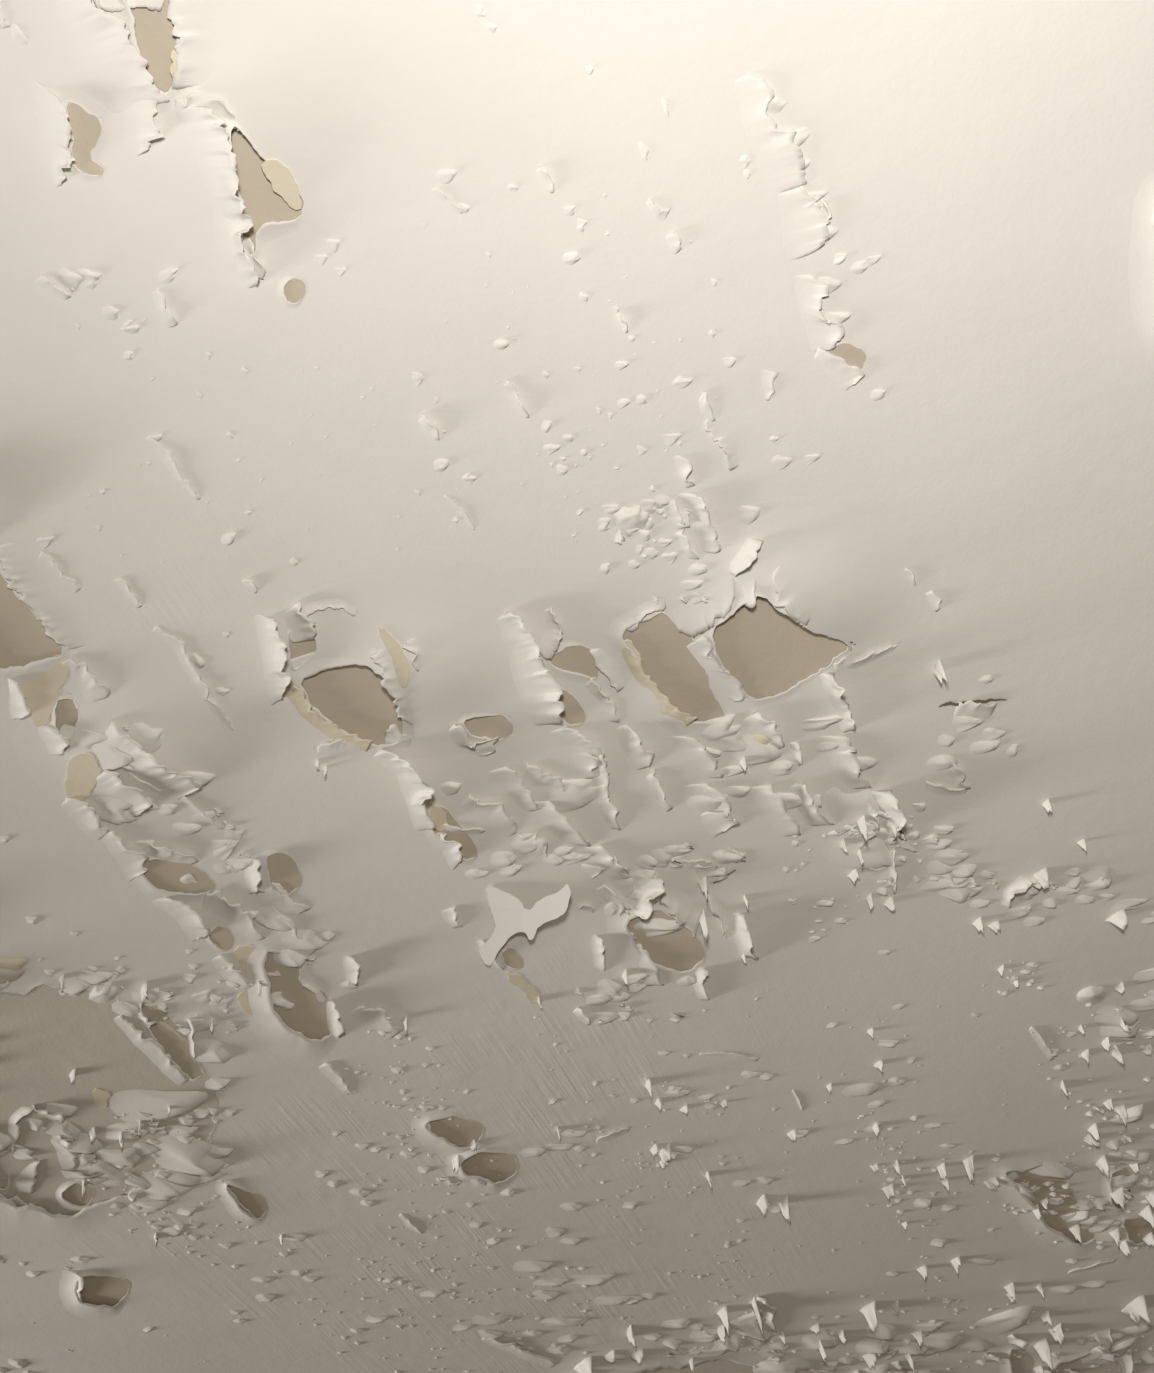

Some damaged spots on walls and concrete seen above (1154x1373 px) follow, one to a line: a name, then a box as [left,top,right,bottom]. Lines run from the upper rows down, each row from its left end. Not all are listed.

peeling [31,0,307,309]
peeling [672,375,740,471]
peeling [734,73,887,401]
peeling [1128,171,1154,367]
peeling [255,433,1150,1071]
peeling [0,536,1154,1373]